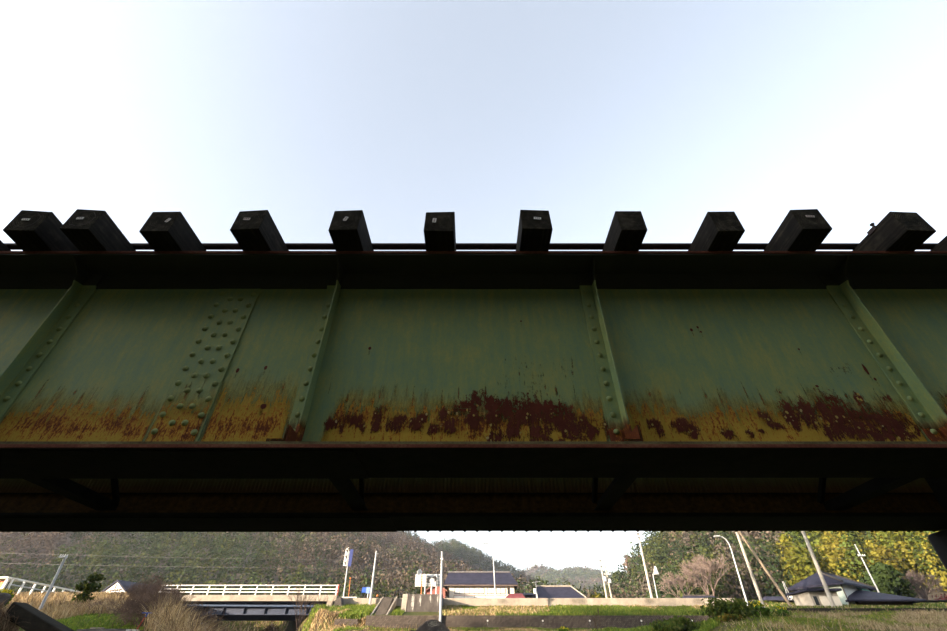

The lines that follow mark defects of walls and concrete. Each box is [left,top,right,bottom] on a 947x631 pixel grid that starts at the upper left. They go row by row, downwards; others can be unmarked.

rust [0,380,306,441]
rust [321,385,947,441]